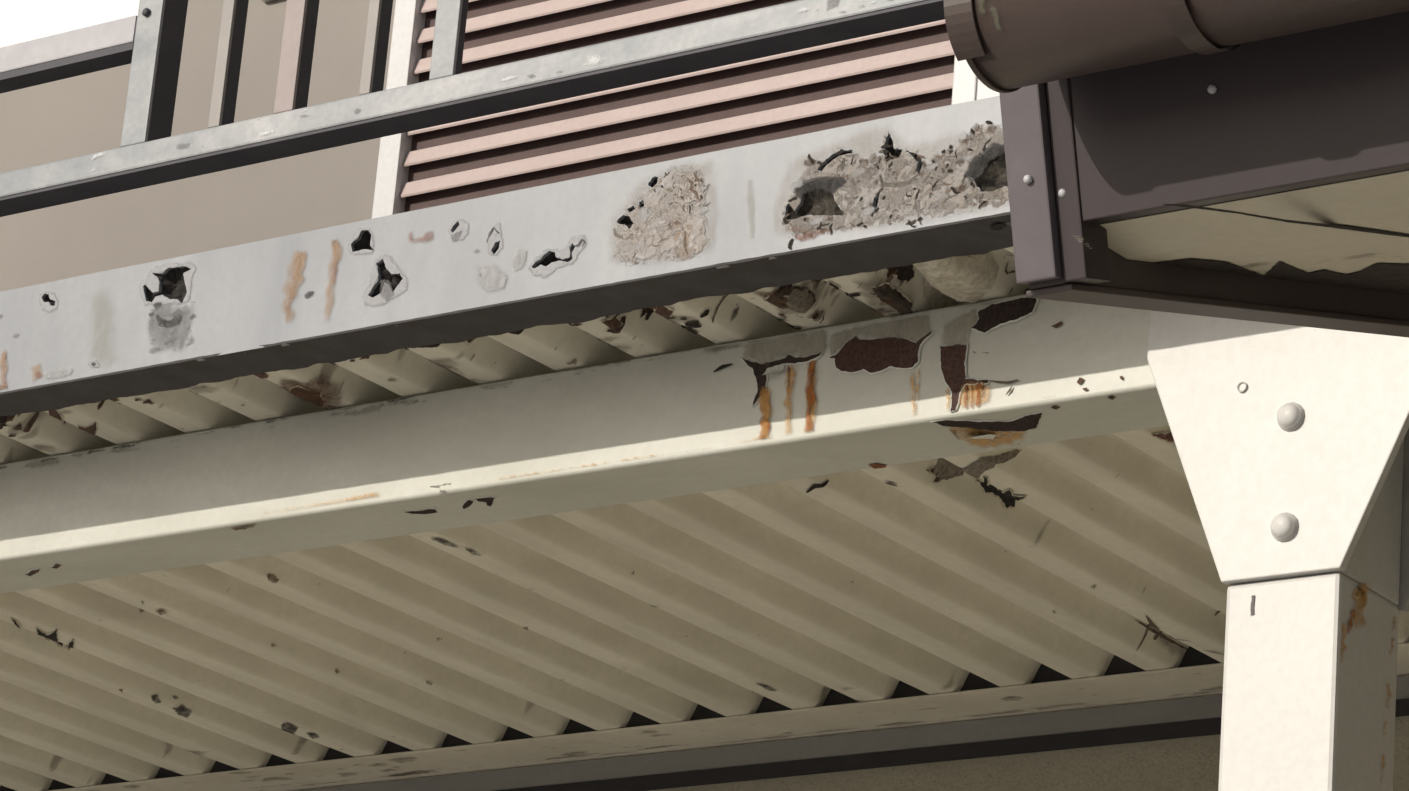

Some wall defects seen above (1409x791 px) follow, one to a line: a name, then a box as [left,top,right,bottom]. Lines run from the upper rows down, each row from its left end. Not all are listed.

spalling [612,165,710,267]
spalling [783,120,1009,249]
spalling [146,267,191,327]
rust [284,240,341,317]
spalling [354,231,403,298]
spalling [535,246,575,268]
peeling [740,264,1060,484]
rust [1343,584,1367,651]